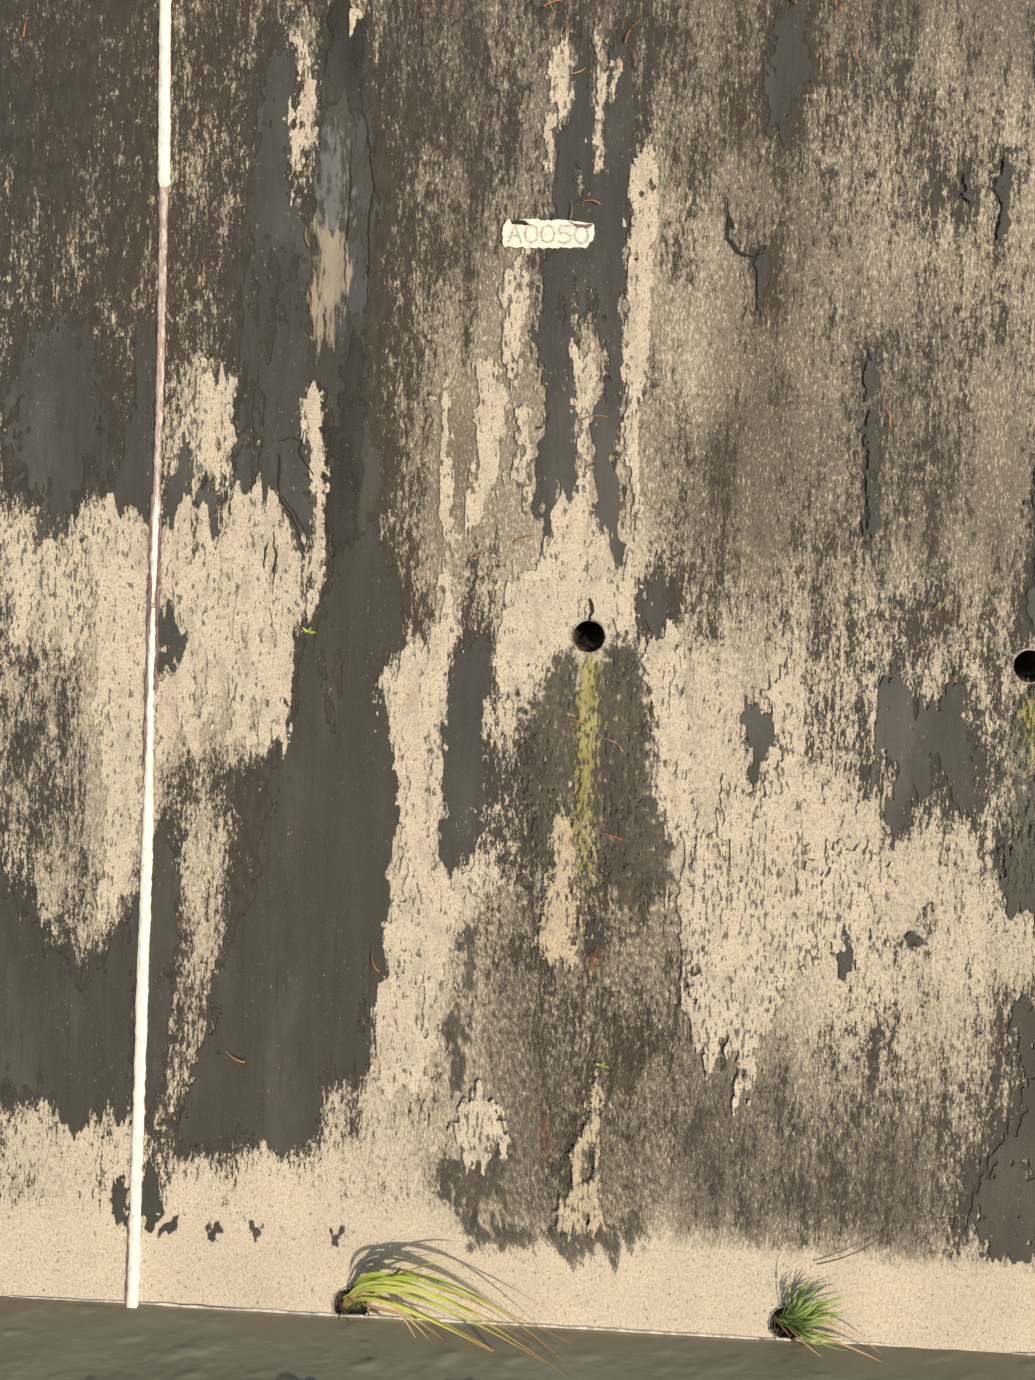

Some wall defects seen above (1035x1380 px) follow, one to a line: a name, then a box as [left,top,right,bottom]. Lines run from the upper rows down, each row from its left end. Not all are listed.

water stain [429,630,701,1277]
water stain [988,678,1035,920]